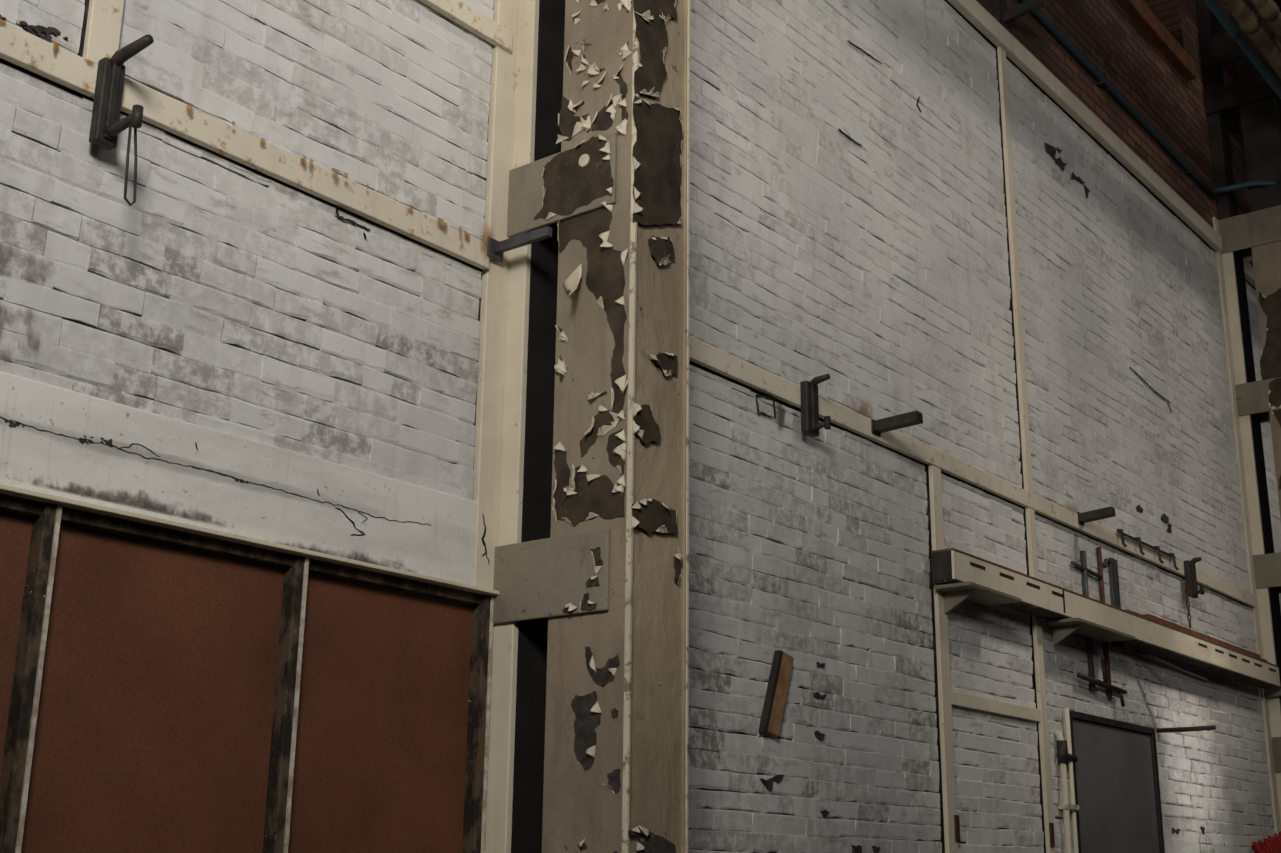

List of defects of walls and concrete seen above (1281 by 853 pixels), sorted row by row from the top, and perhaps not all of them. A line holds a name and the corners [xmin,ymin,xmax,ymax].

spalling [1044,143,1090,198]
corrosion [437,217,493,249]
peeling [533,0,684,584]
peeling [1258,288,1281,427]
crack [0,417,430,536]
peeling [562,547,603,613]
peeling [571,647,620,771]
peeling [603,769,621,794]
peeling [628,825,676,853]